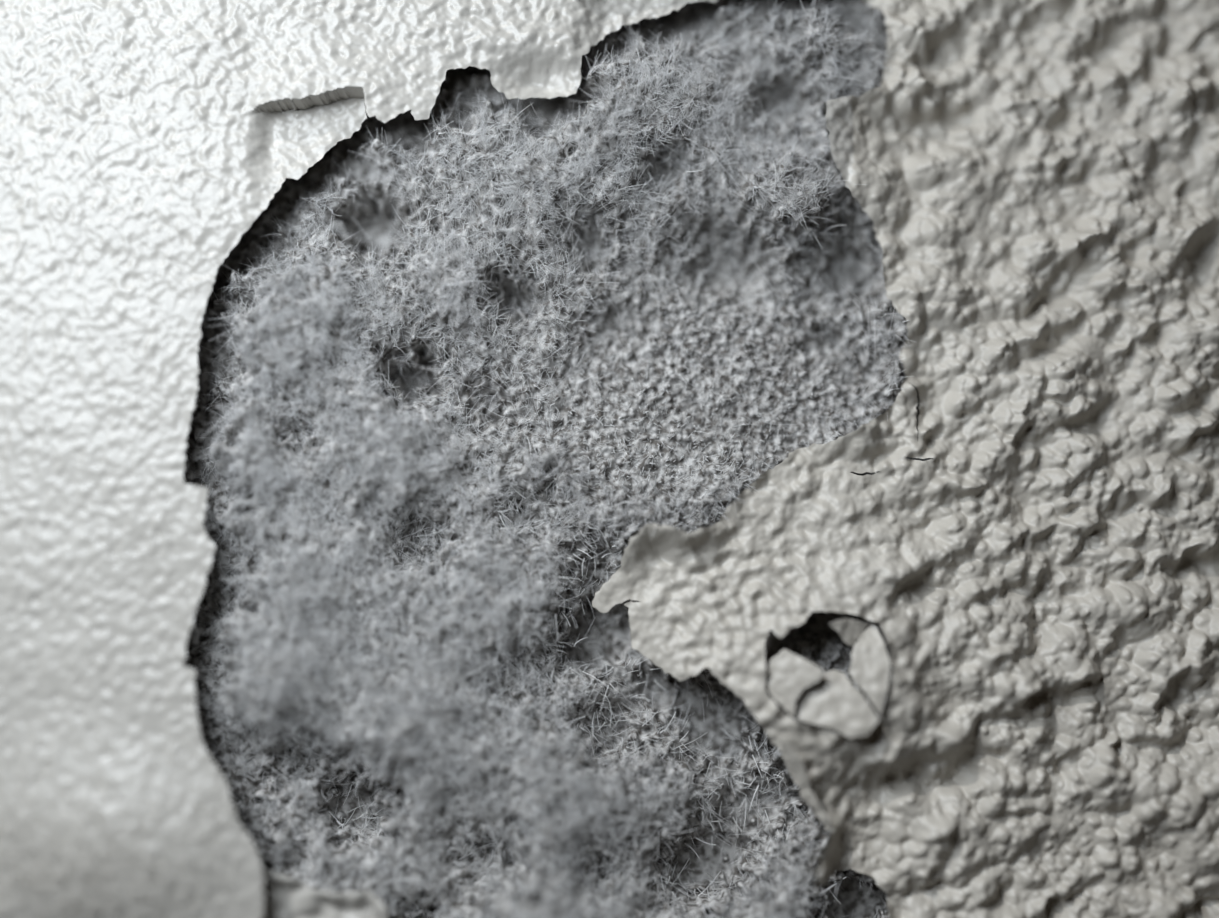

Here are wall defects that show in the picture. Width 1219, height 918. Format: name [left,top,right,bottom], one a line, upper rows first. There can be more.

flaking render [183,0,918,918]